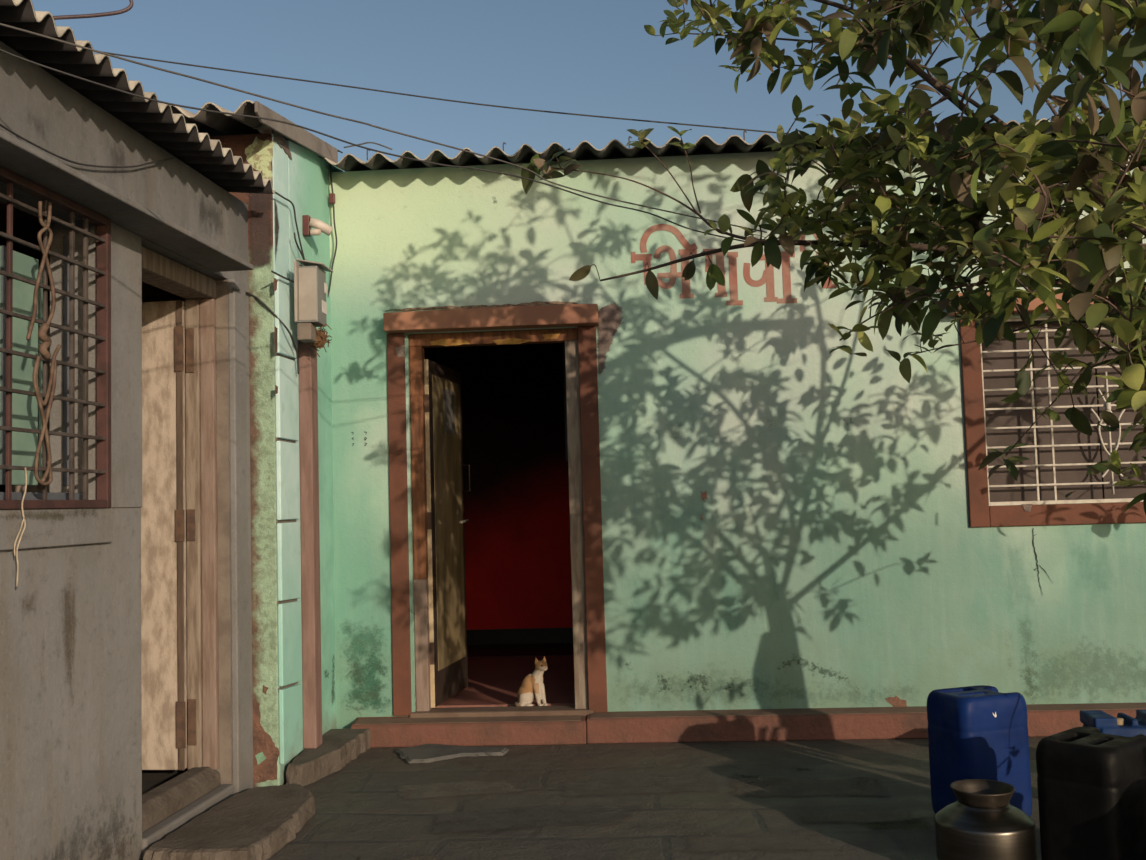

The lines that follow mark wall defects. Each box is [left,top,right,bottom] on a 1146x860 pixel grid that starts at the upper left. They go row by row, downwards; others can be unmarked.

water stain [249,193,279,267]
spalling [386,301,578,311]
peeling [493,332,560,345]
spalling [598,305,619,371]
crack [1032,528,1053,596]
peeling [252,685,279,784]